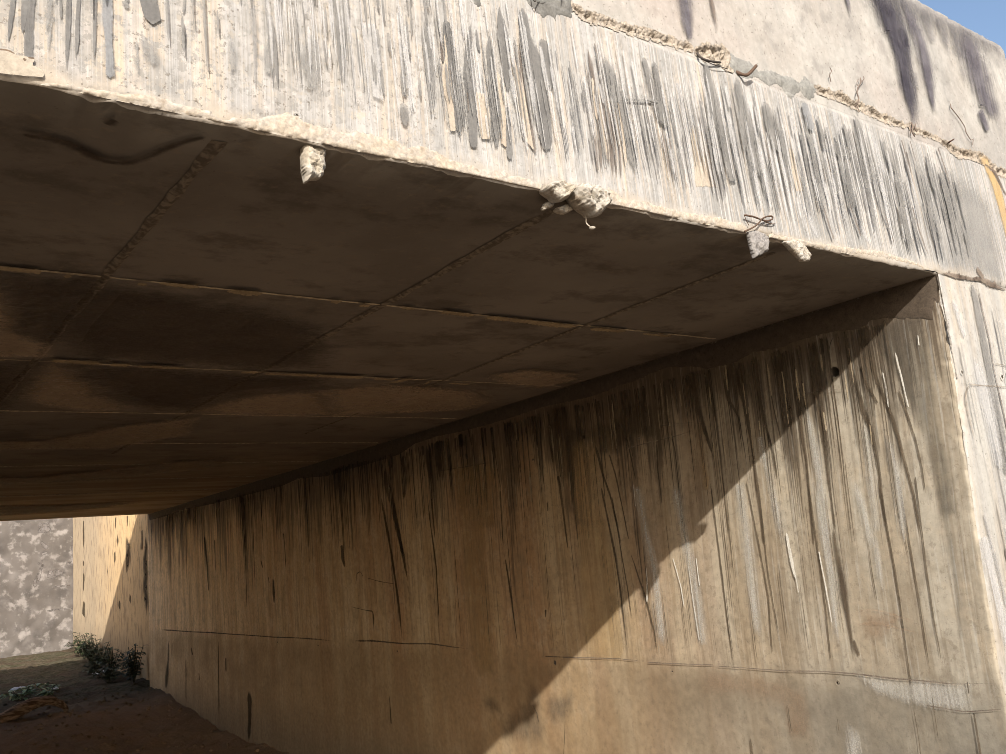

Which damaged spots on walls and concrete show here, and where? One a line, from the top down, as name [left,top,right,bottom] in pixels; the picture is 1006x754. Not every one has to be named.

leakage [8,0,169,78]
leakage [181,0,219,70]
spalling [0,50,543,190]
leakage [250,0,999,276]
spalling [540,201,573,215]
crack [985,164,1006,195]
crack [943,267,1005,290]
leakage [953,283,1006,494]
crack [965,364,1006,432]
leakage [0,274,969,754]
leakage [982,504,1006,641]